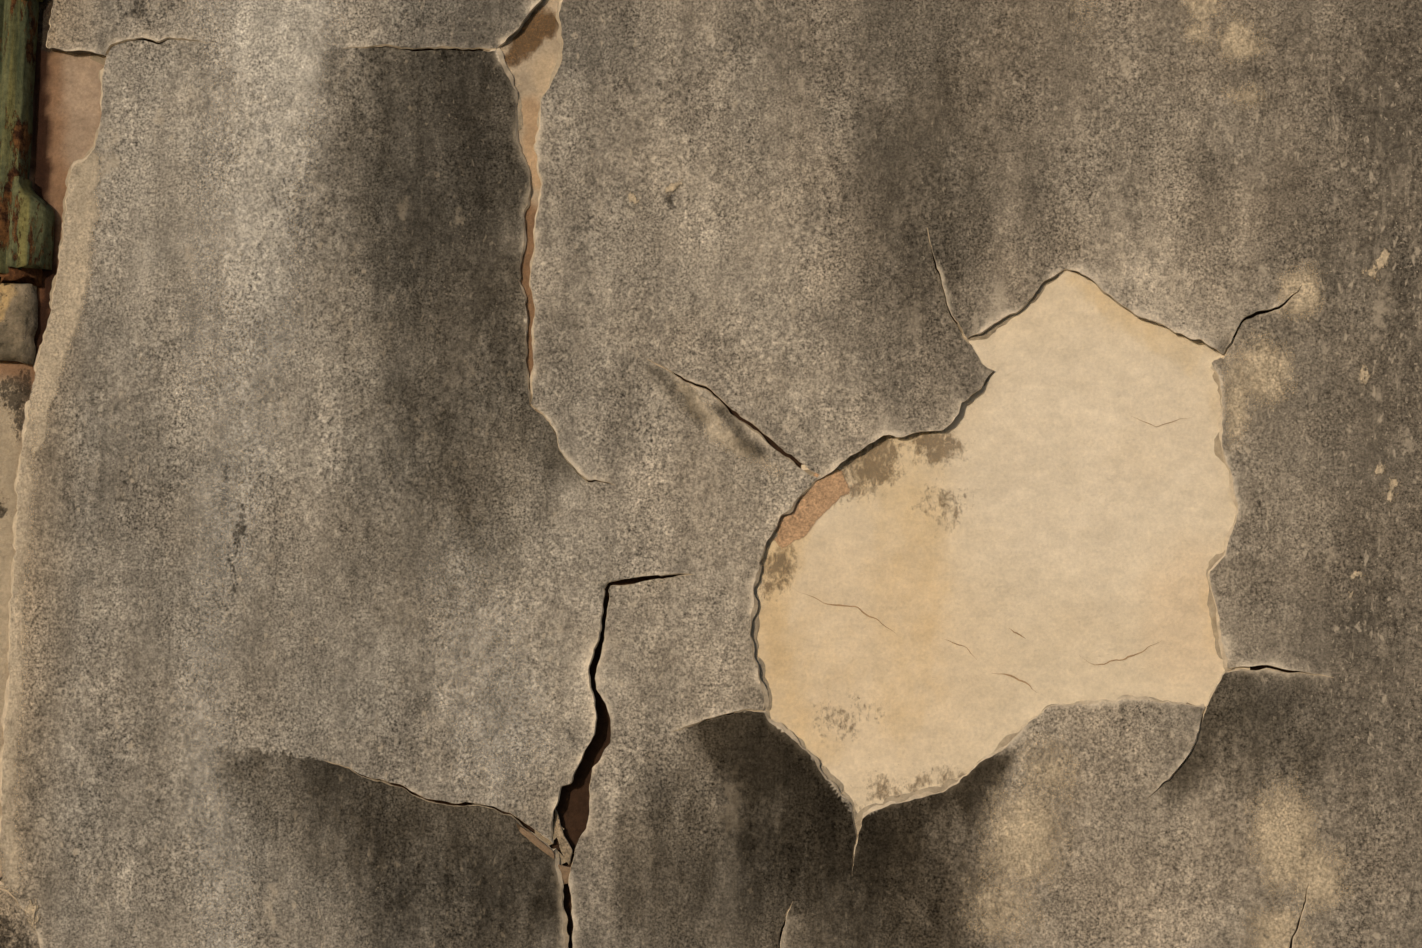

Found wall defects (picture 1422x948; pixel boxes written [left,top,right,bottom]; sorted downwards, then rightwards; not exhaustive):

peeling [481,0,581,412]
crack [645,353,816,480]
leakage [765,550,790,591]
leakage [842,432,961,497]
peeling [724,246,1265,835]
crack [324,557,691,948]
crack [670,689,761,731]
leakage [697,711,1074,948]